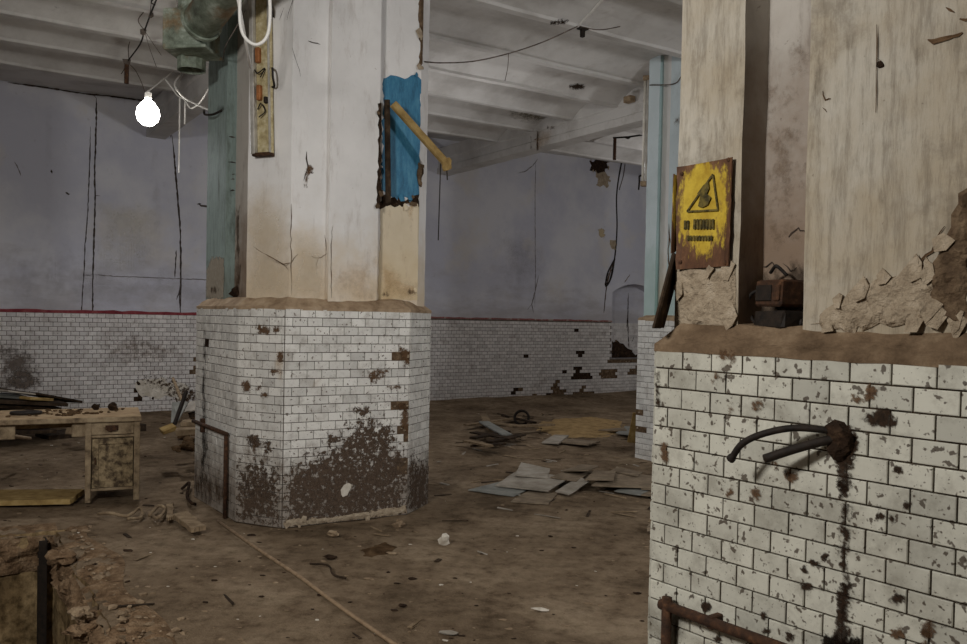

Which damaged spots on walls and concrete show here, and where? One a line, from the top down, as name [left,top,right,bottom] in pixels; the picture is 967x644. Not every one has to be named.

peeling [375,0,424,301]
spalling [511,340,637,395]
peeling [635,409,647,433]
rust [890,627,905,639]
rust [919,619,936,644]